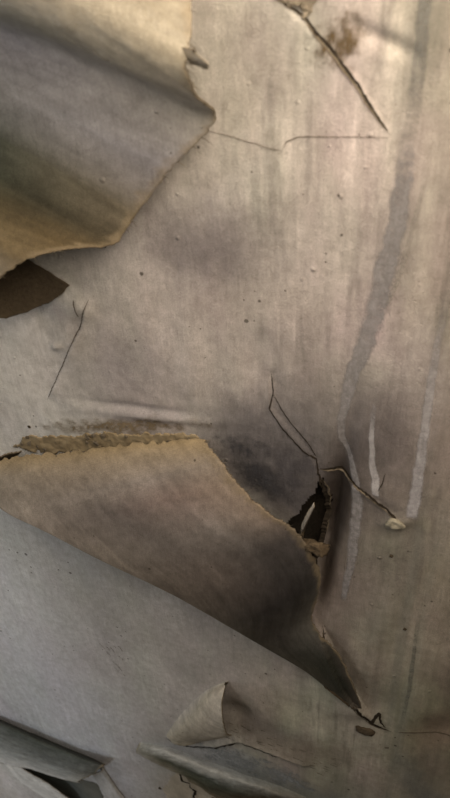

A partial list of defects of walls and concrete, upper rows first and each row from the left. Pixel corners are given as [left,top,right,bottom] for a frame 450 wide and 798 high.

peeling [277,0,317,19]
peeling [13,426,199,454]
crack [269,374,322,488]
peeling [23,768,104,798]
peeling [158,773,215,798]